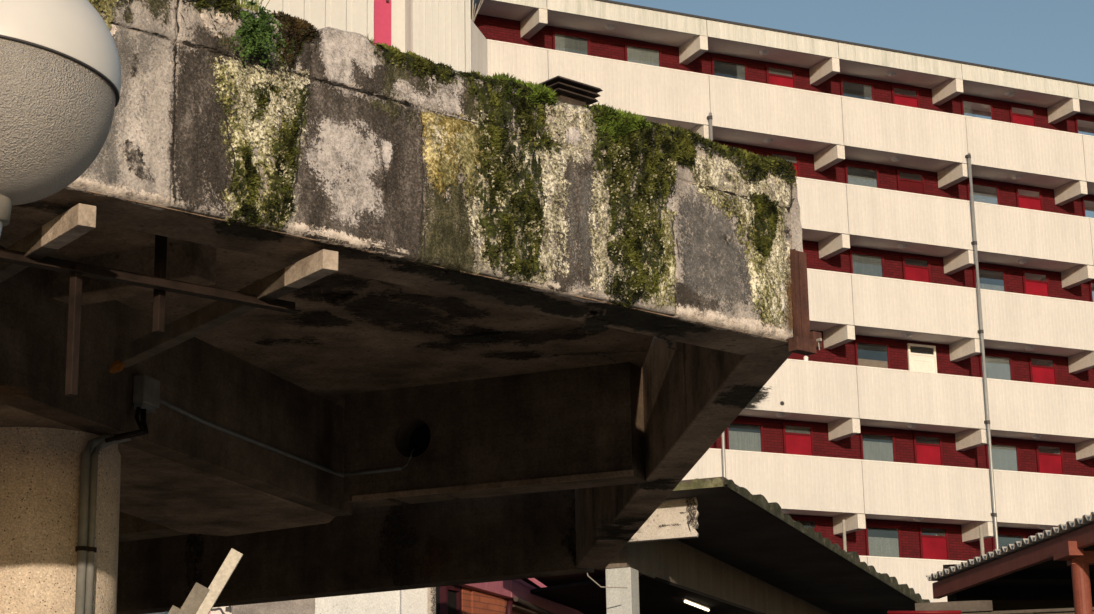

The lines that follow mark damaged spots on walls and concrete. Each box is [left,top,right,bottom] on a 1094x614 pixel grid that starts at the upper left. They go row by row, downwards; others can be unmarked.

crack [104,0,481,254]
water stain [82,0,793,377]
water stain [714,384,771,409]